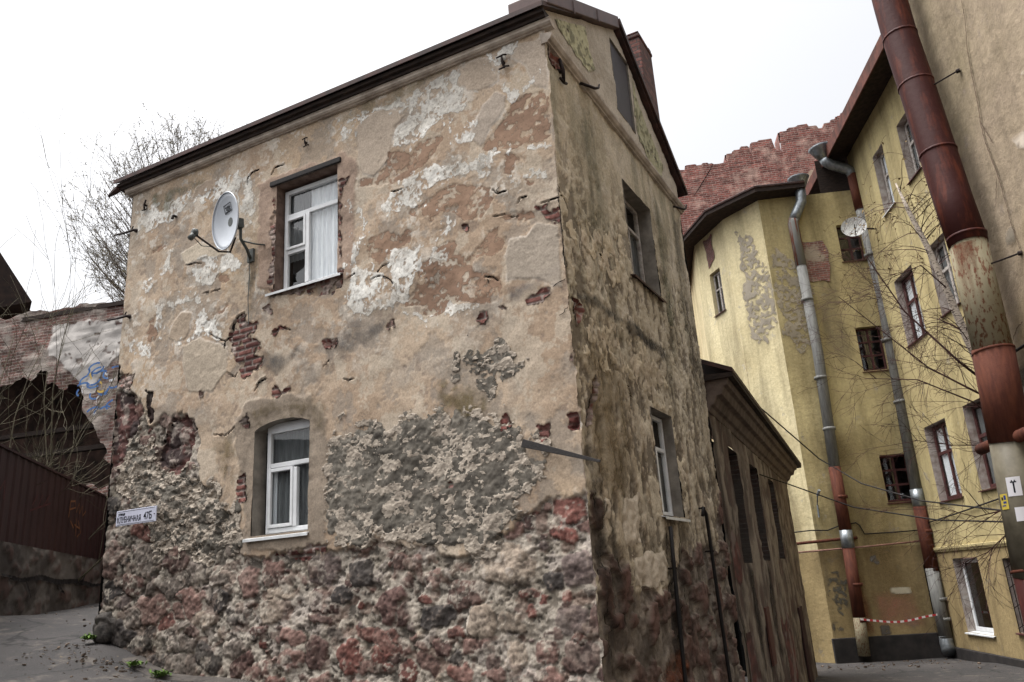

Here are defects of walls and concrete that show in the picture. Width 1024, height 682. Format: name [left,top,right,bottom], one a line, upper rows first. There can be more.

peeling [262,41,627,330]
peeling [48,245,264,394]
peeling [734,231,830,353]
spalling [111,373,247,573]
spalling [275,337,551,565]